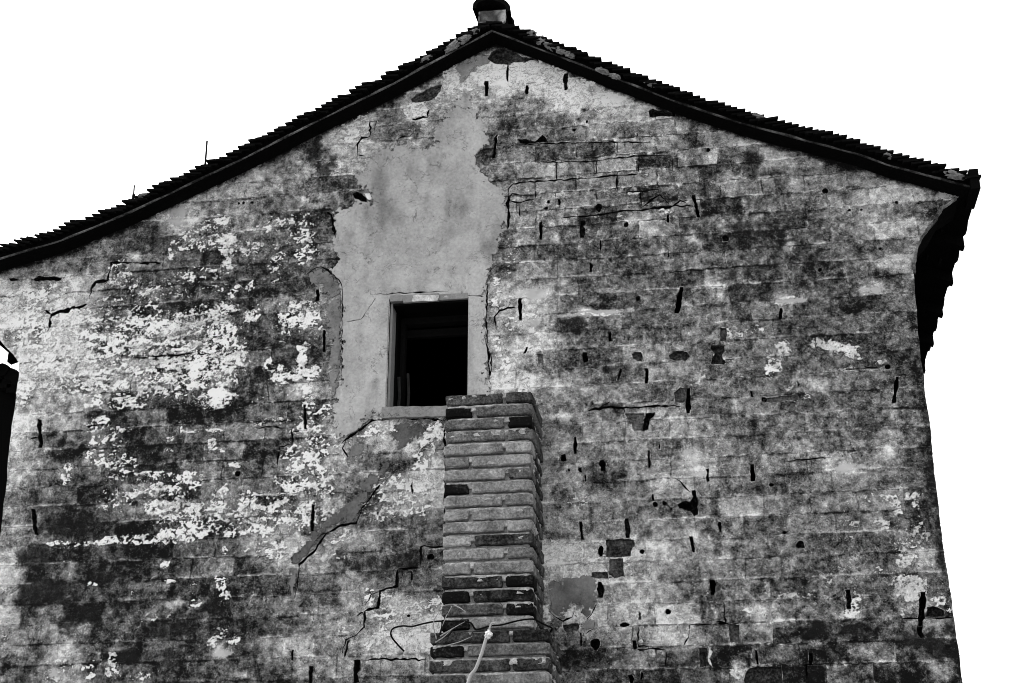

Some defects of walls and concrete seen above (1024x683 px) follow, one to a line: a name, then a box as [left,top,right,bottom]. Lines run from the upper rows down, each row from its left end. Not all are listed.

crack [505,193,519,229]
crack [45,261,161,332]
peeling [0,213,398,560]
peeling [809,337,863,372]
damp [3,514,150,637]
crack [294,475,413,599]
crack [341,418,446,662]
peeling [363,417,446,522]
spalling [543,538,645,588]
damp [921,403,948,576]
damp [113,597,230,671]
damp [800,619,960,661]